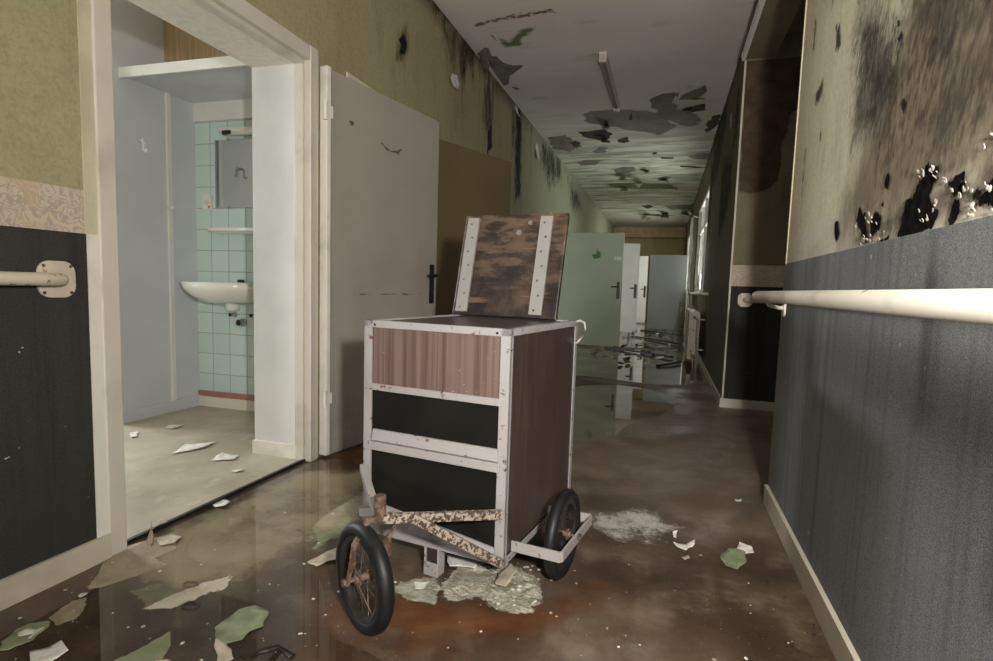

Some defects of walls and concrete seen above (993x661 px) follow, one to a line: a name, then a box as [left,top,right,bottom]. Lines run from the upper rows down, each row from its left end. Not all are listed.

peeling [477,35,523,90]
water stain [483,84,498,153]
water stain [512,107,532,201]
water stain [540,146,561,190]
peeling [535,84,733,165]
peeling [609,167,677,192]
peeling [639,204,694,218]
peeling [652,152,709,168]
water stain [707,57,801,236]
water stain [848,0,993,242]
spalling [855,162,993,246]